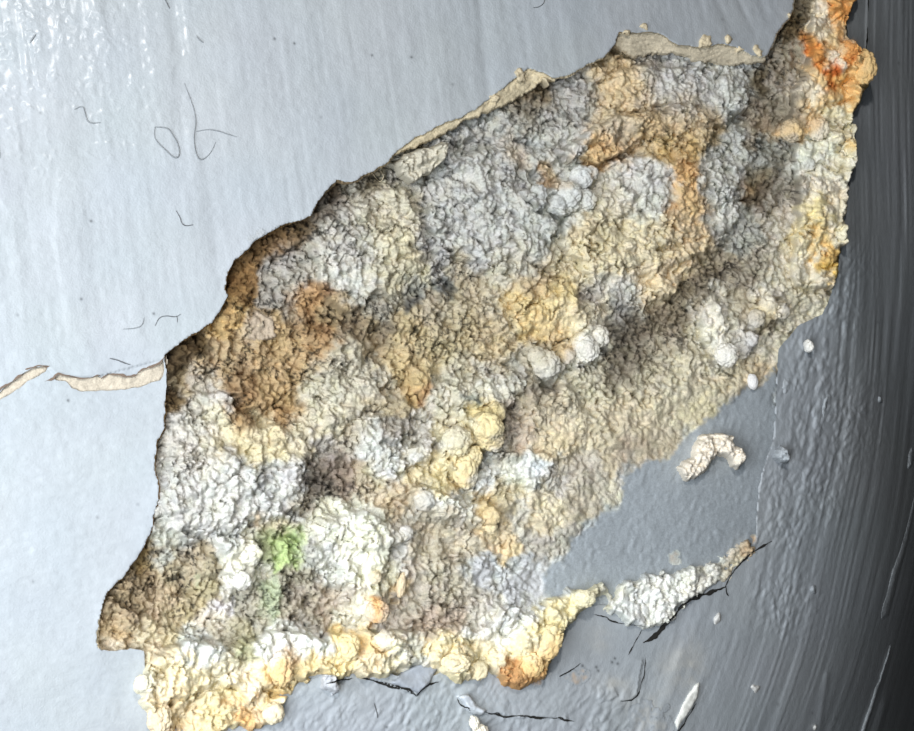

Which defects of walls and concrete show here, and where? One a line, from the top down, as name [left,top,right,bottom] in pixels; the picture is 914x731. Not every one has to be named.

corrosion [821,0,857,26]
corrosion [804,28,862,94]
leakage [780,0,878,291]
spalling [96,0,833,663]
leakage [160,60,790,592]
crack [0,356,168,399]
leakage [133,502,758,731]
peeling [320,674,340,696]
peeling [391,665,438,694]
peeling [457,694,487,716]
crack [457,699,574,722]
peeling [675,682,700,730]